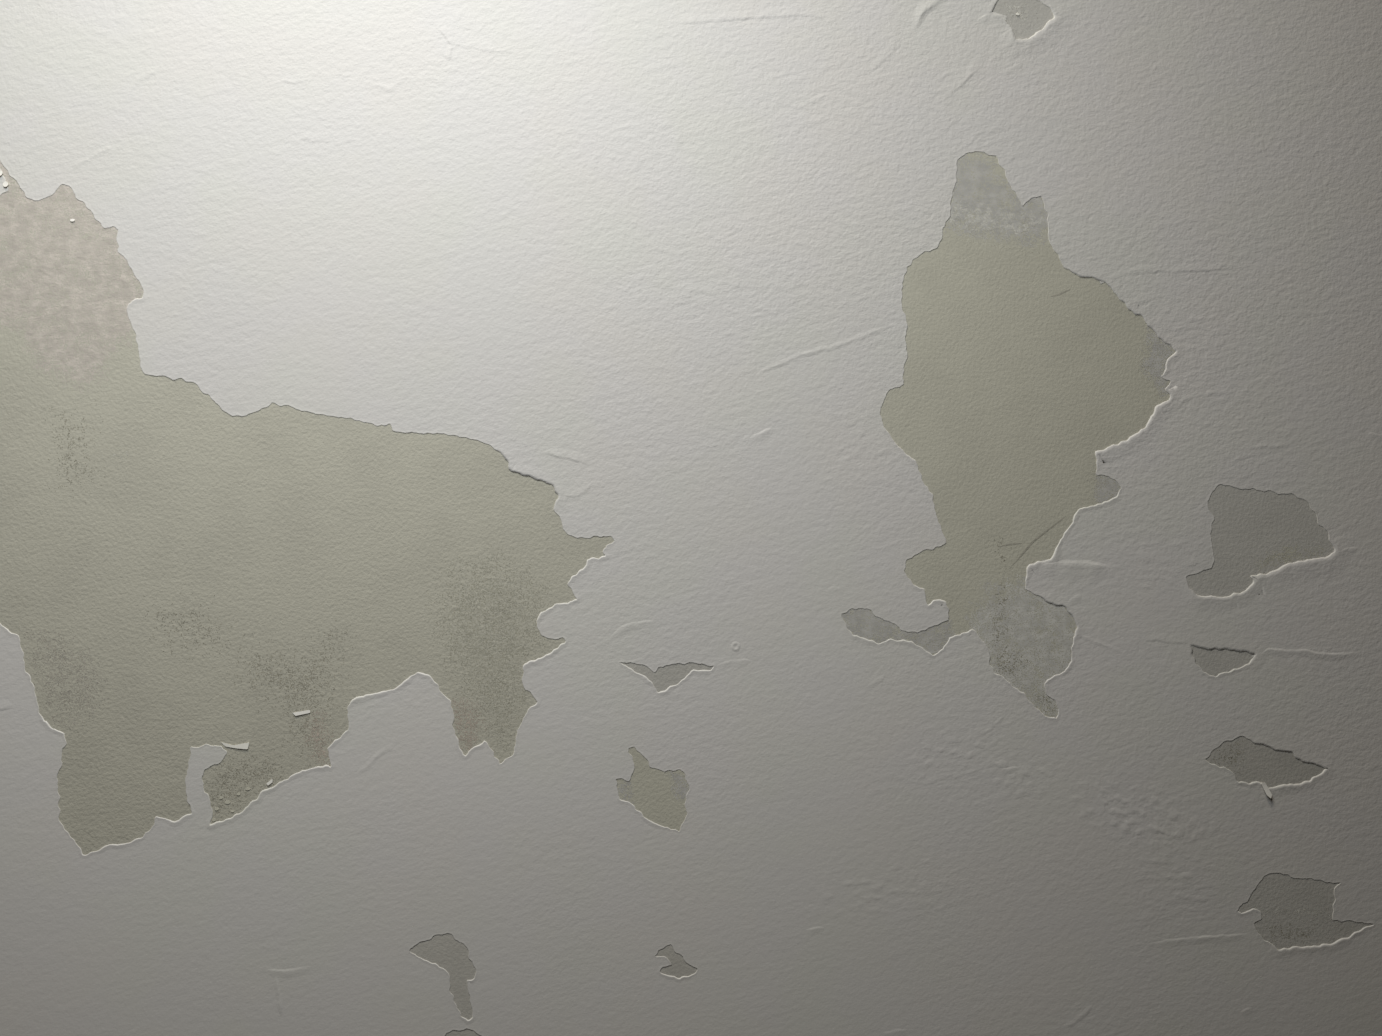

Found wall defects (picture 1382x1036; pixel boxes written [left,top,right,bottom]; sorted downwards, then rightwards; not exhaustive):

peeling [981,0,1073,60]
peeling [840,149,1186,723]
peeling [0,155,617,859]
peeling [1184,483,1353,612]
peeling [617,660,717,697]
peeling [1180,633,1266,680]
peeling [614,745,692,833]
peeling [1202,734,1335,798]
peeling [1234,871,1376,959]
peeling [408,932,484,1036]
peeling [653,943,699,983]